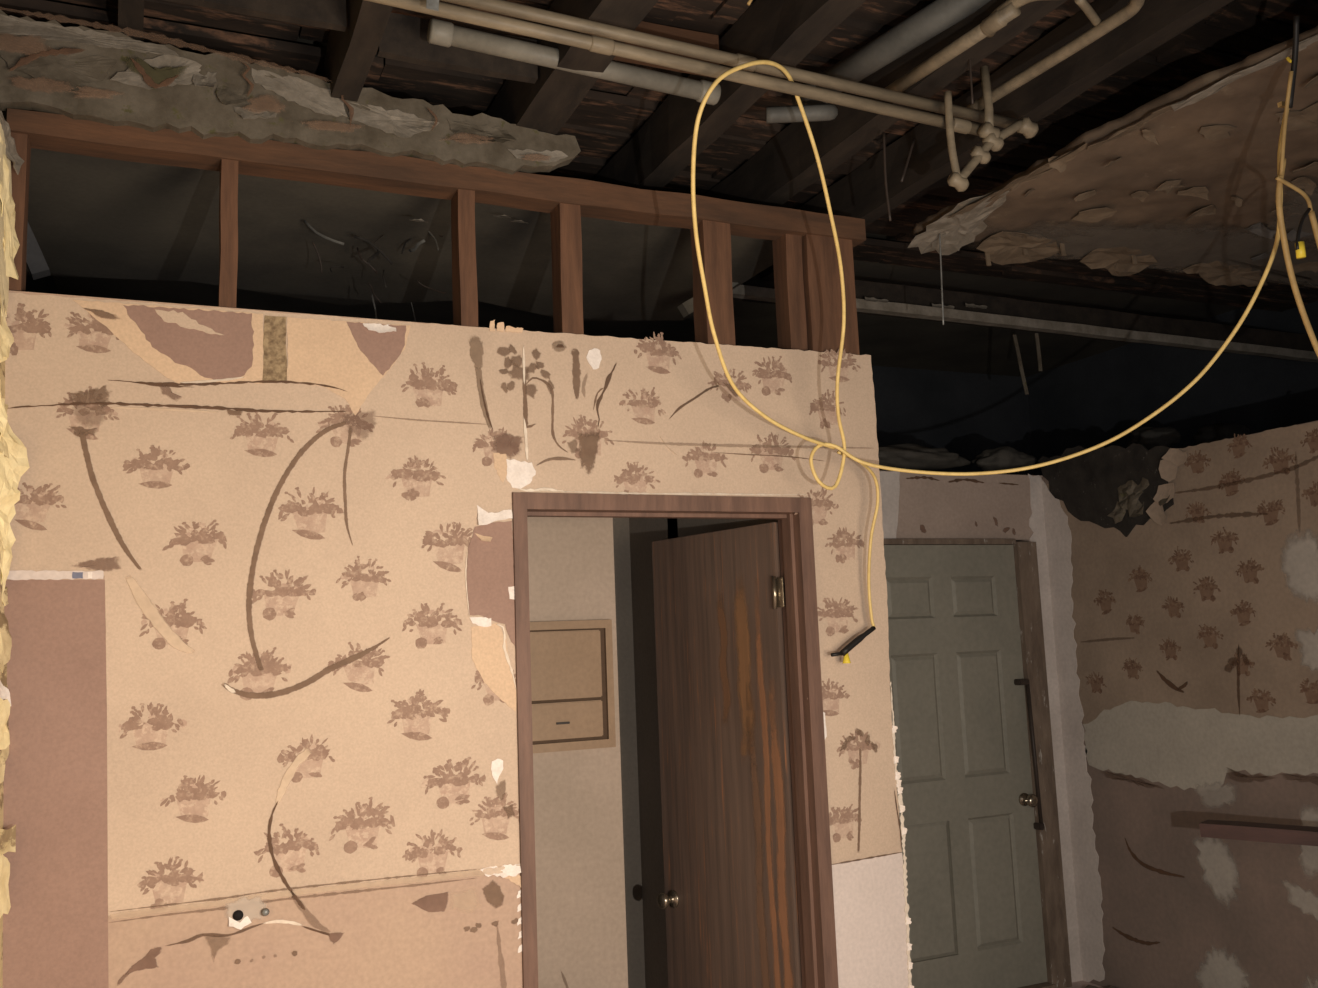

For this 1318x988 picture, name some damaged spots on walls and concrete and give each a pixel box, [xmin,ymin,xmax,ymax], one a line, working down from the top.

flaking render [0,14,568,163]
peeling [0,123,14,363]
crack [12,380,345,415]
hole [1038,443,1187,537]
peeling [0,392,119,988]
crack [168,749,343,946]